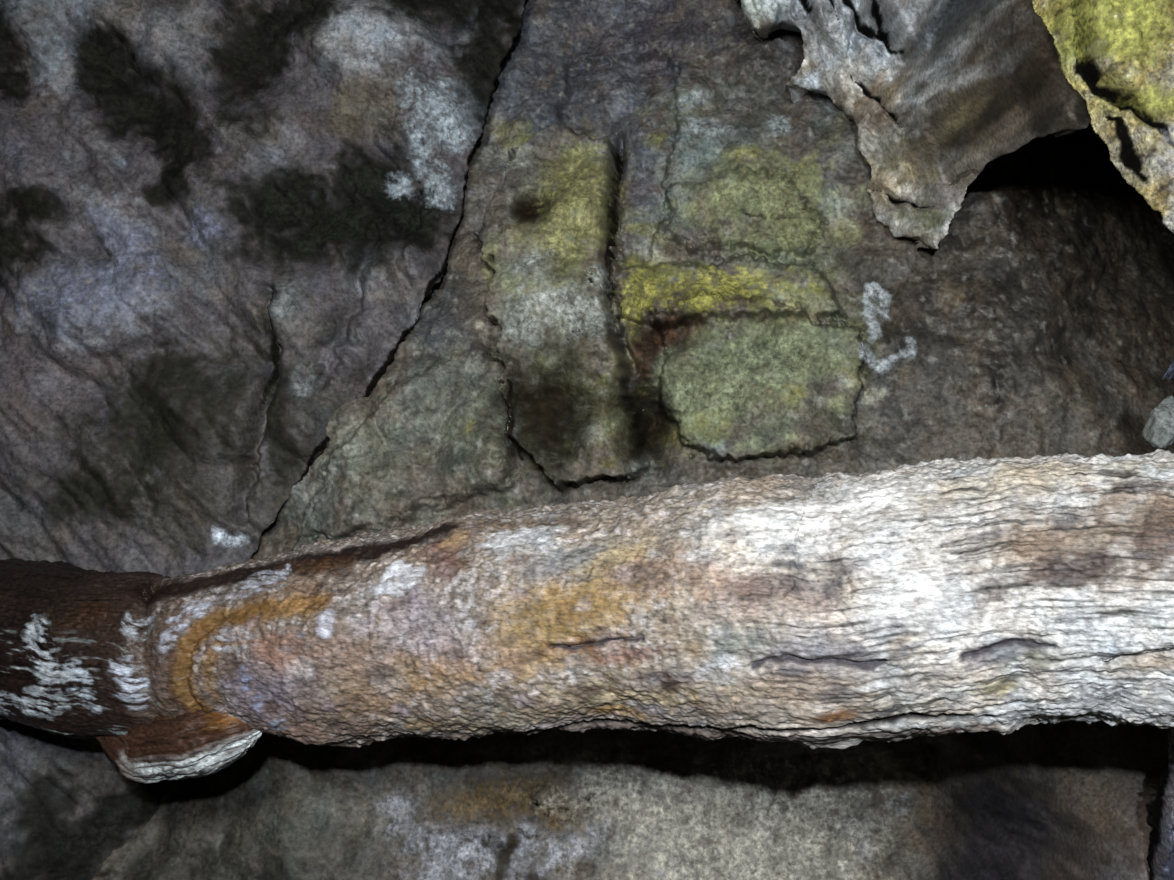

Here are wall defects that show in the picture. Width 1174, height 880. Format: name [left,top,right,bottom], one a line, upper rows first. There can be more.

crack [364,171,469,397]
crack [262,288,280,404]
crack [296,436,330,484]